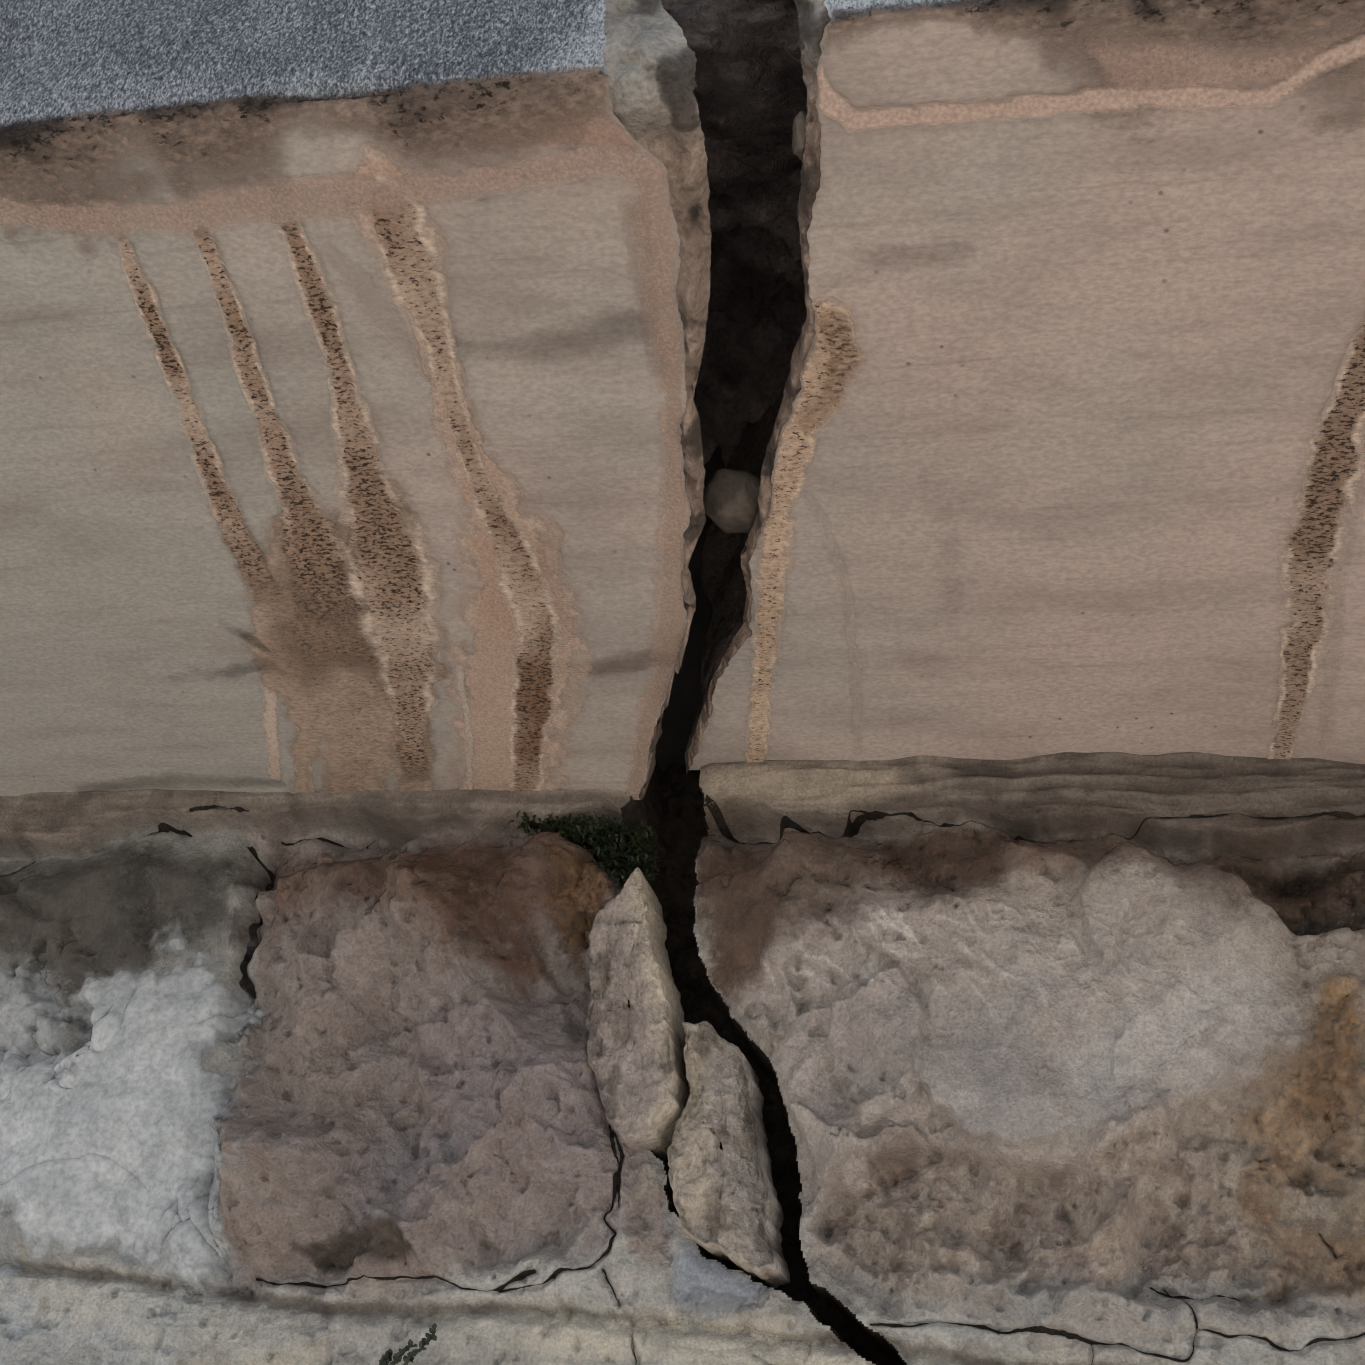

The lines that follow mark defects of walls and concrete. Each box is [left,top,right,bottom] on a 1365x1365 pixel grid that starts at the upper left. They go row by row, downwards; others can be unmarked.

water stain [0,67,688,799]
crack [661,0,807,465]
water stain [818,0,1365,132]
water stain [1268,321,1365,759]
crack [256,1124,679,1365]
crack [528,758,1365,1365]